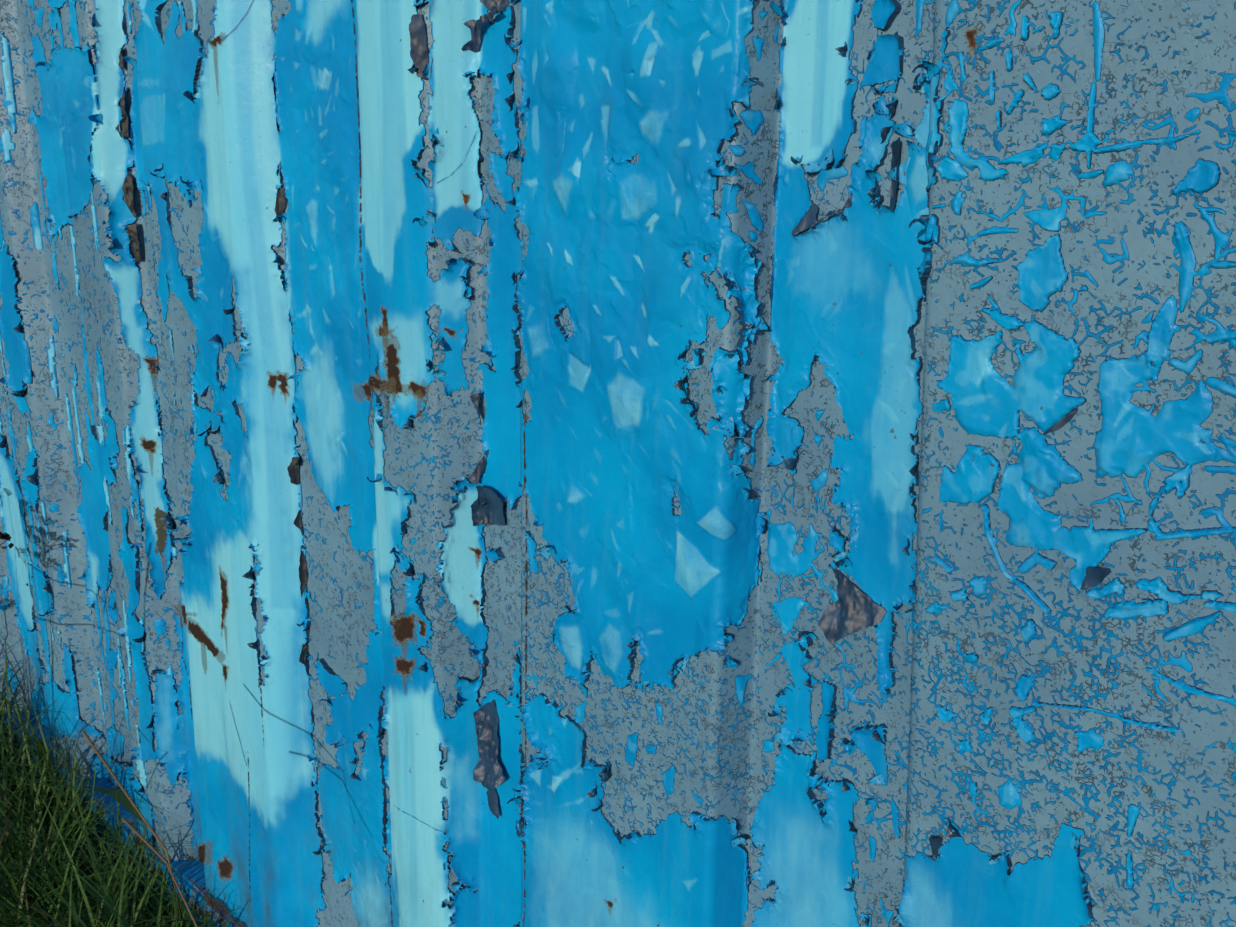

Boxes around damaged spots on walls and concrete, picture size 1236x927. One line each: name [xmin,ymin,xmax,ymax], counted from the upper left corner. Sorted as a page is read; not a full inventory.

peeling [271,0,291,33]
peeling [272,163,289,284]
corrosion [268,375,288,394]
corrosion [361,308,425,399]
peeling [0,0,248,861]
peeling [367,0,1236,927]
corrosion [181,606,227,679]
corrosion [220,574,228,628]
peeling [242,543,268,684]
peeling [287,420,390,927]
corrosion [390,615,425,642]
corrosion [199,845,233,878]